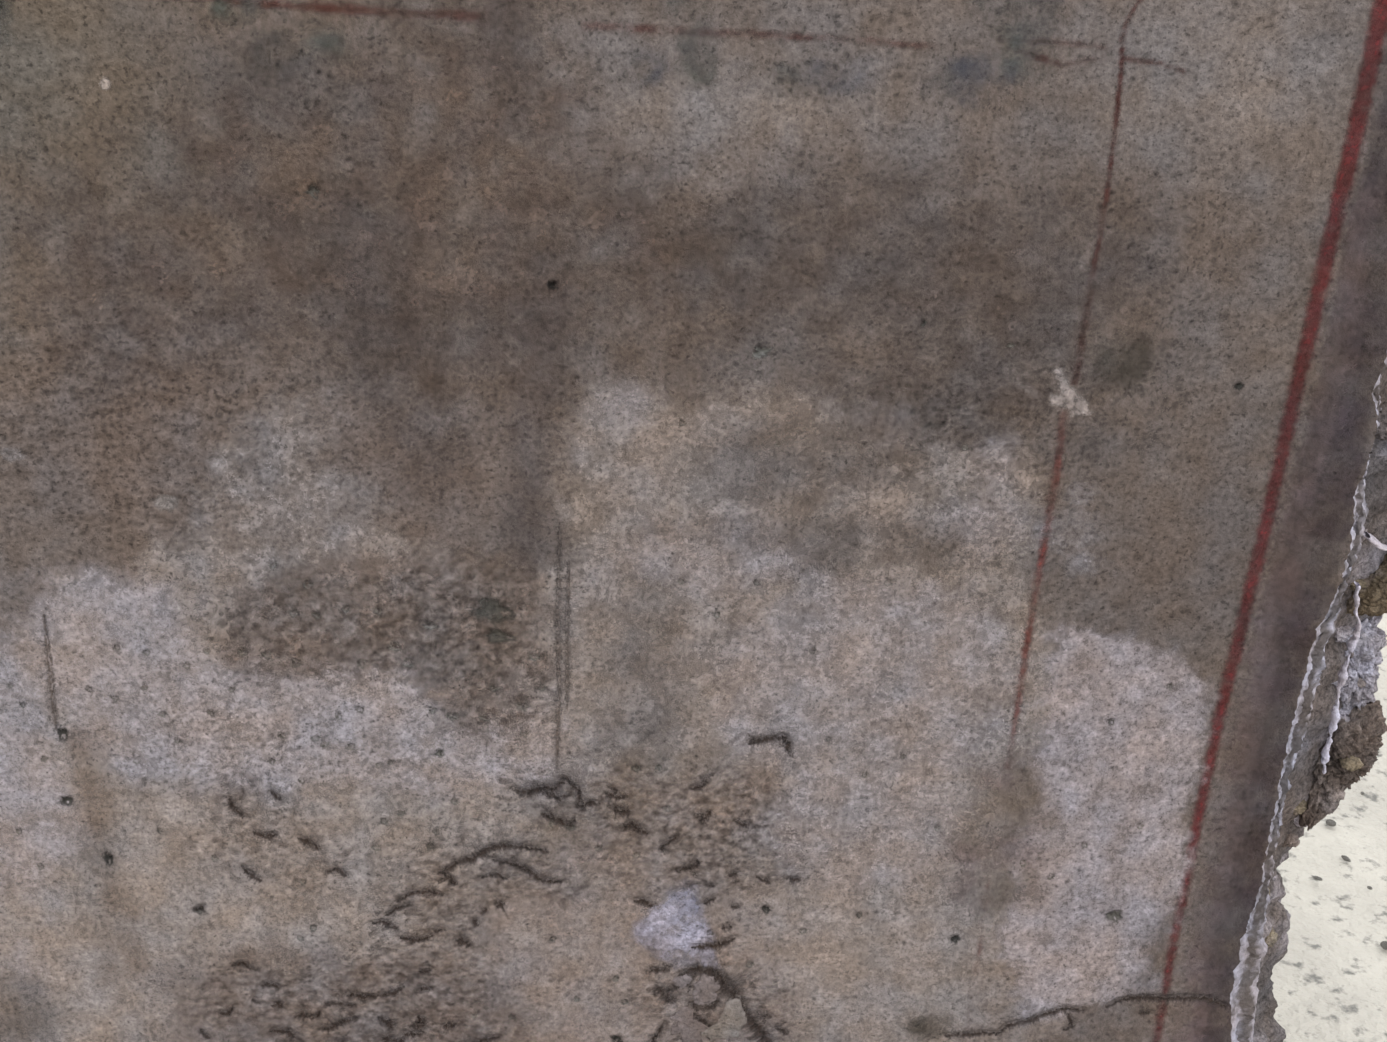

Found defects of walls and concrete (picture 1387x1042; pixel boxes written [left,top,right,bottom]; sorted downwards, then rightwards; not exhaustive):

spalling [1230,357,1387,1042]
crack [748,733,794,757]
crack [396,772,781,910]
crack [646,962,789,1042]
crack [945,993,1226,1038]